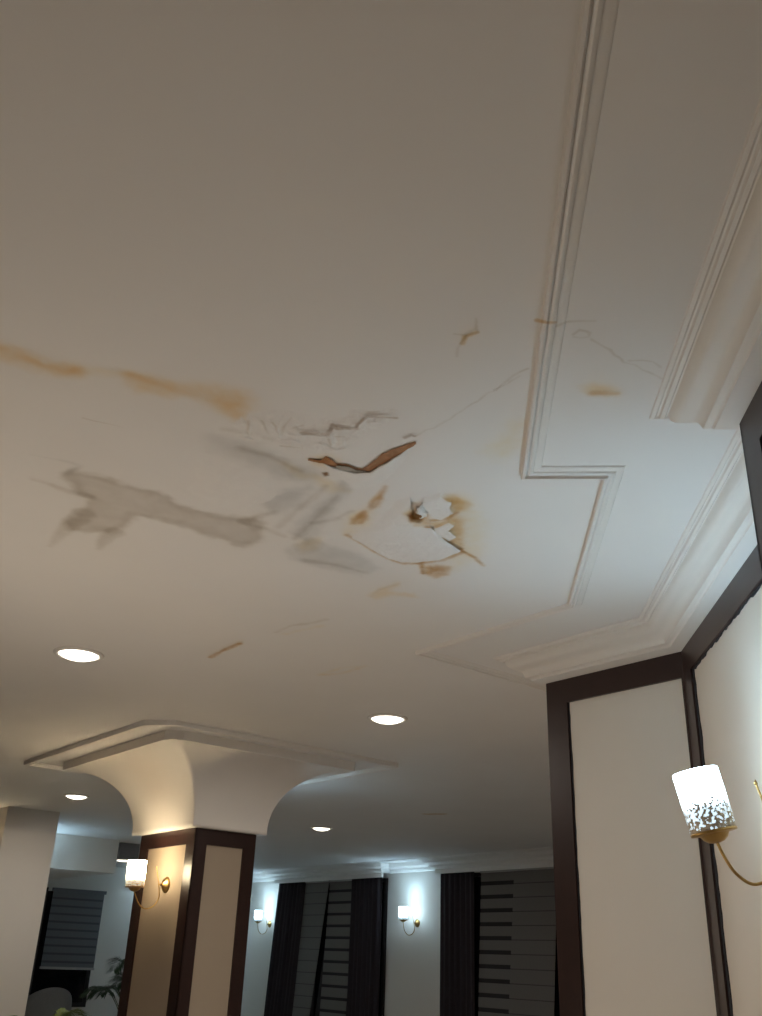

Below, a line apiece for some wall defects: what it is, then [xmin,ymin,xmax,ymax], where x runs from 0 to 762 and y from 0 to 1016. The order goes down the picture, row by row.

peeling [308,442,416,476]
peeling [348,492,461,563]